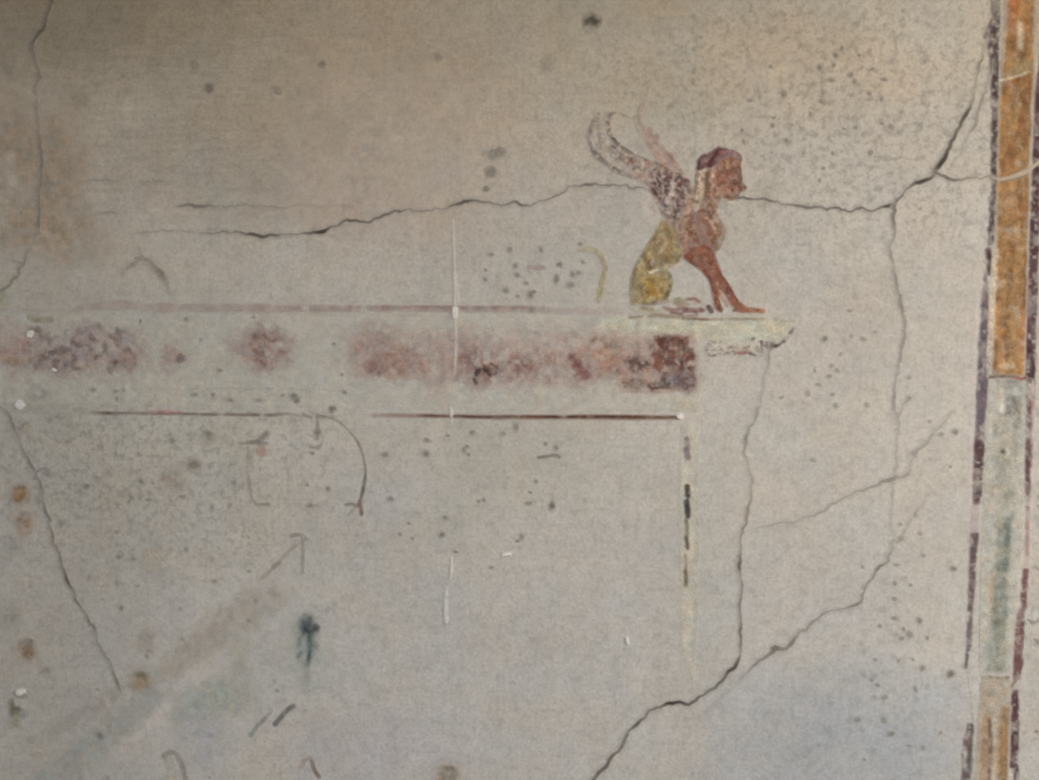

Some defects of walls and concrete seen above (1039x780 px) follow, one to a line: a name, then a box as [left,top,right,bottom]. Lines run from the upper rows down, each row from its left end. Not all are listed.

crack [31,0,53,86]
crack [0,136,43,292]
crack [221,183,639,239]
crack [736,58,1039,410]
crack [4,409,121,691]
crack [816,445,925,515]
crack [592,500,903,780]